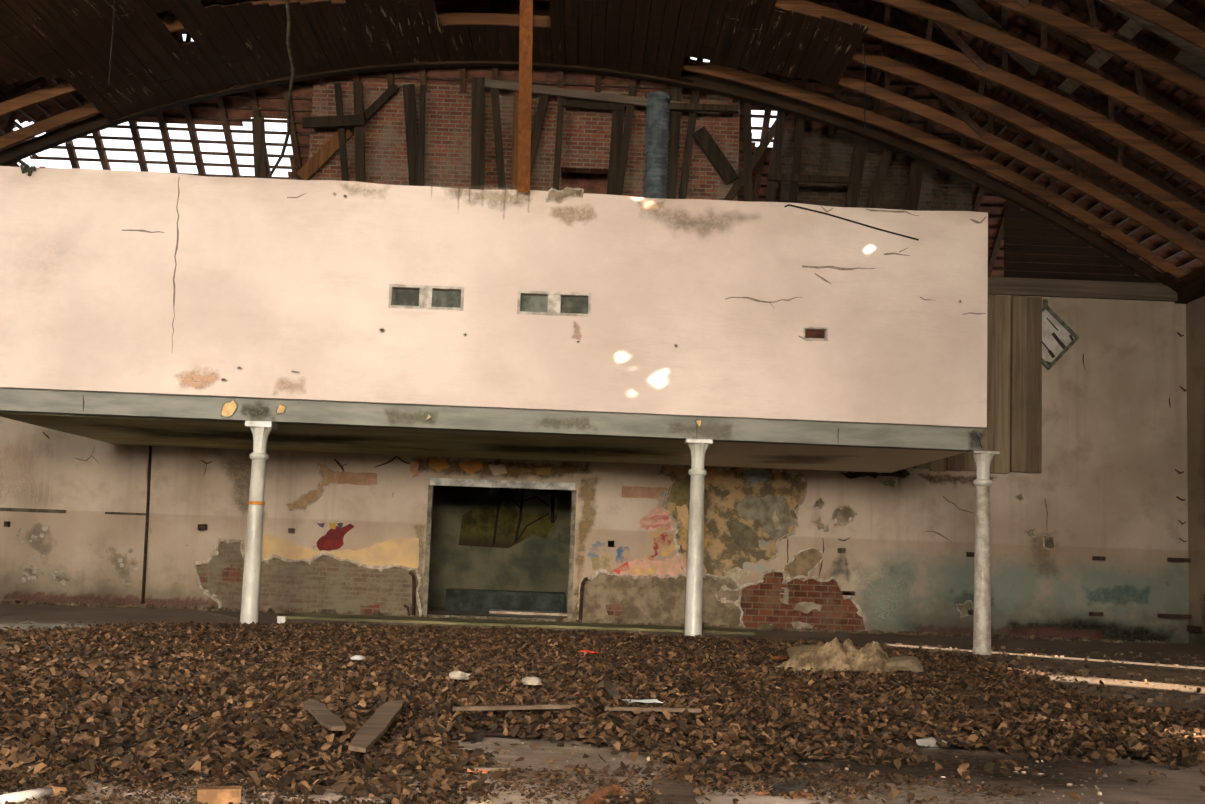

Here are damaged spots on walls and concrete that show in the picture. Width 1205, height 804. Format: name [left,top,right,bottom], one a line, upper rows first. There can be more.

flaking render [546,187,584,204]
crack [122,177,180,350]
crack [725,248,910,309]
flaking render [4,525,246,610]
flaking render [259,534,422,617]
flaking render [577,464,867,631]